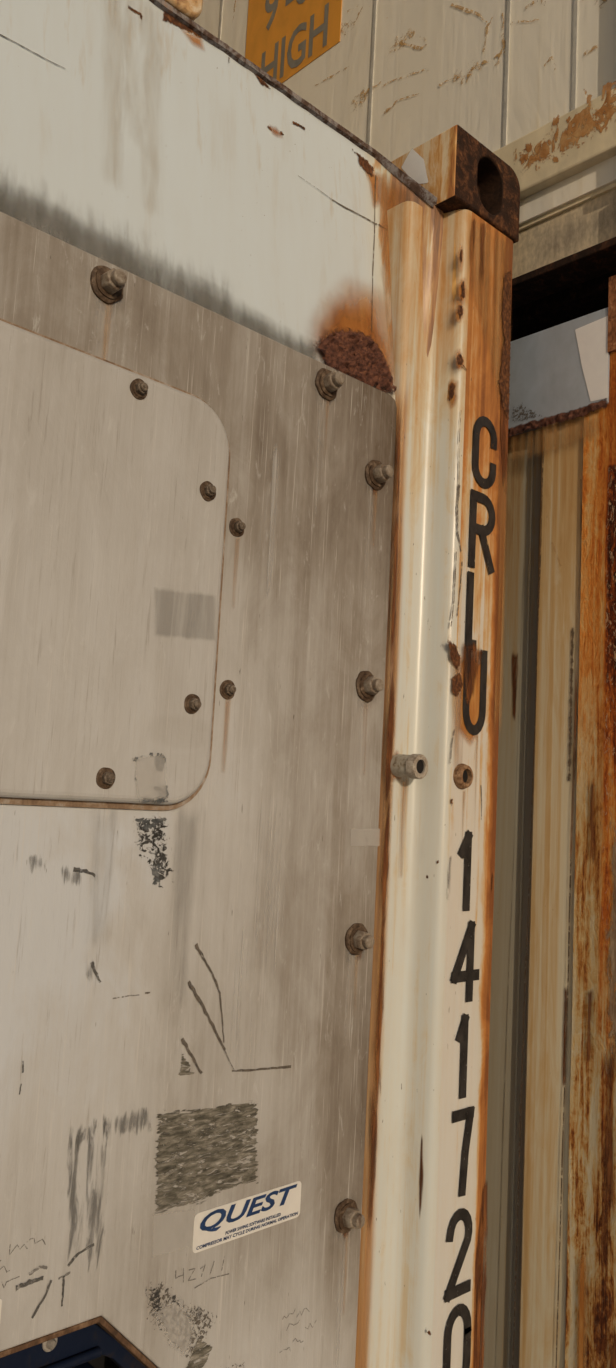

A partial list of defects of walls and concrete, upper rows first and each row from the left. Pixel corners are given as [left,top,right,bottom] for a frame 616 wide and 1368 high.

rust [385,188,395,295]
rust [448,640,518,745]
rust [556,628,594,1368]
rust [601,1056,614,1268]